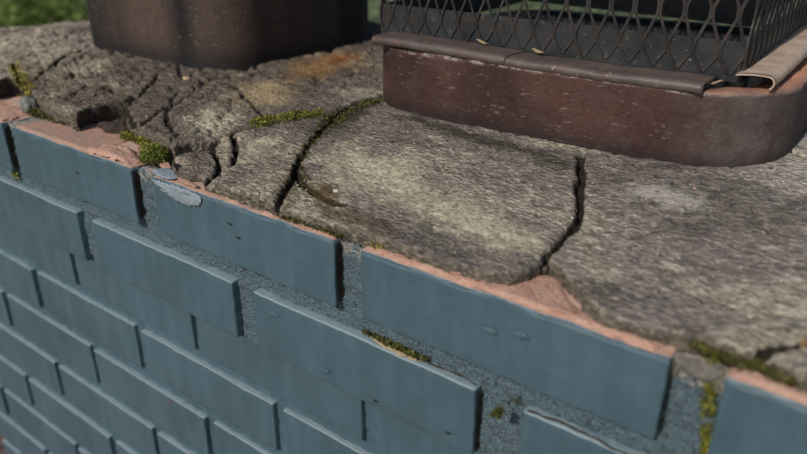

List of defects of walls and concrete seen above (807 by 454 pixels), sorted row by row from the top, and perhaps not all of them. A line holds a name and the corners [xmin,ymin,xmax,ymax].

crack [11,51,81,97]
spalling [0,102,144,166]
peeling [152,162,201,206]
crack [124,65,263,187]
crack [274,103,359,217]
spalling [262,210,333,237]
crack [540,157,586,276]
spalling [369,245,665,353]
peeling [370,336,421,362]
crack [427,361,475,385]
peeling [673,350,807,404]
crack [753,333,807,368]